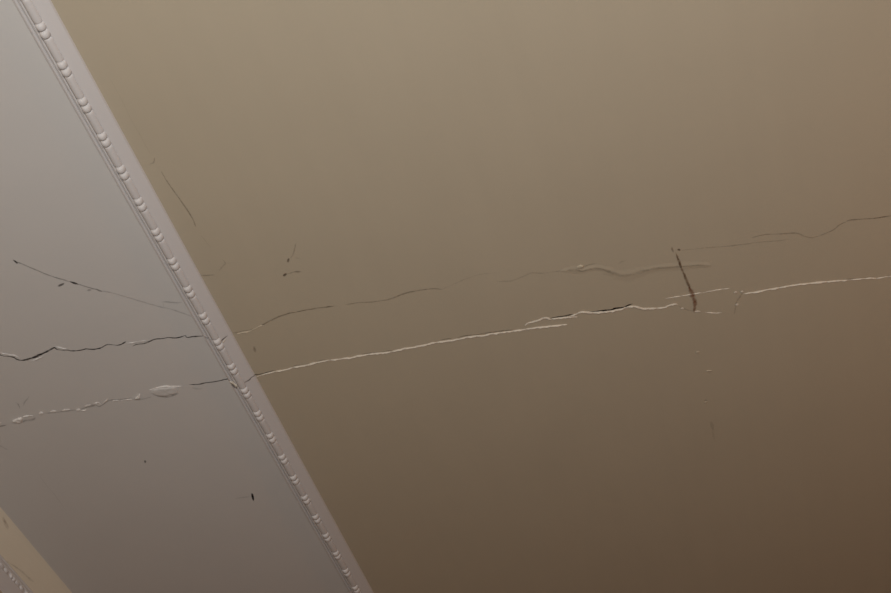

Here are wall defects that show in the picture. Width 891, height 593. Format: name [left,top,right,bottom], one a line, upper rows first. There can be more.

crack [192,276,891,388]
crack [0,335,200,361]
crack [12,394,140,423]